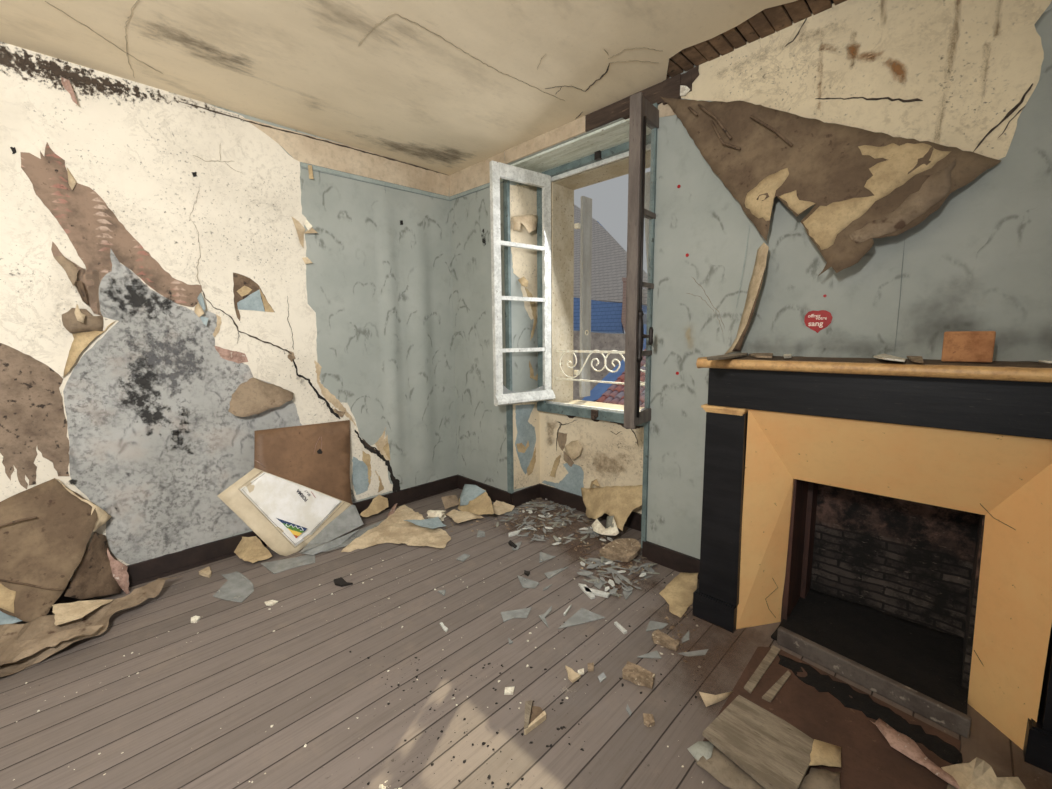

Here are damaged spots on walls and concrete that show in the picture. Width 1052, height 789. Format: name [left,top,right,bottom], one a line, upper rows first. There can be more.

crack [45,0,160,76]
leakage [0,42,242,121]
crack [359,13,659,118]
peeling [680,0,1052,160]
leakage [100,276,175,319]
peeling [0,41,400,502]
crack [189,193,396,483]
leakage [120,330,204,454]
peeling [513,402,540,489]